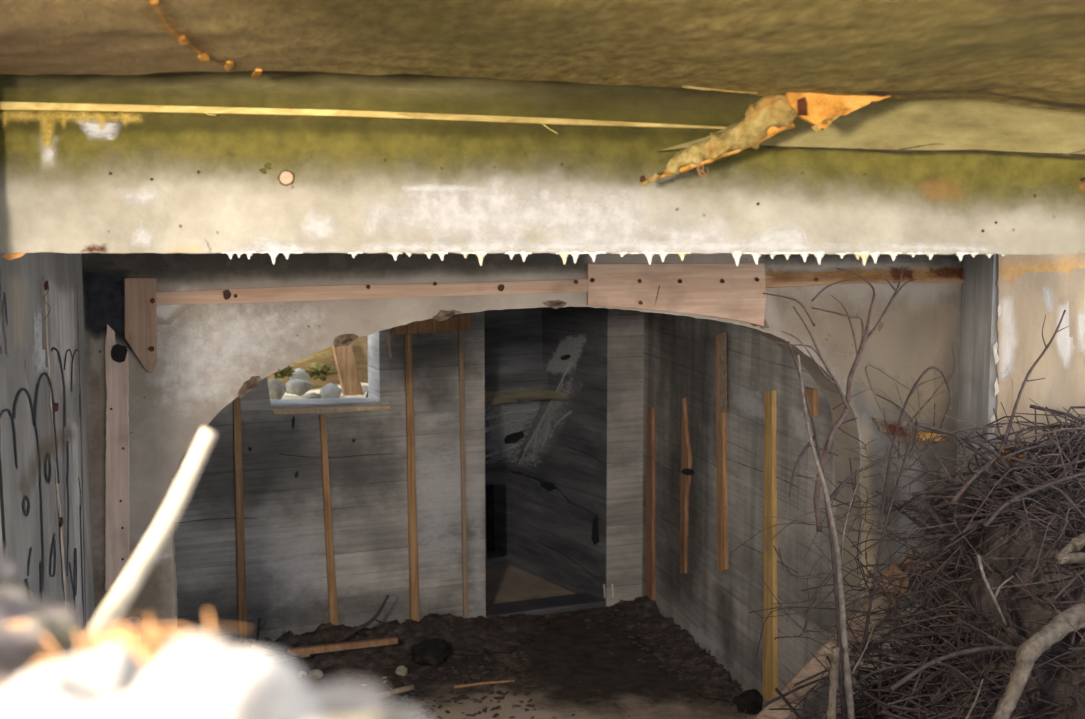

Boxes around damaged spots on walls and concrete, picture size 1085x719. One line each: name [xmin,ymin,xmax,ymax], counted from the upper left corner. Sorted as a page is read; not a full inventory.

spalling [682,86,757,94]
spalling [785,93,890,132]
leakage [1,186,985,682]
leakage [998,268,1085,473]